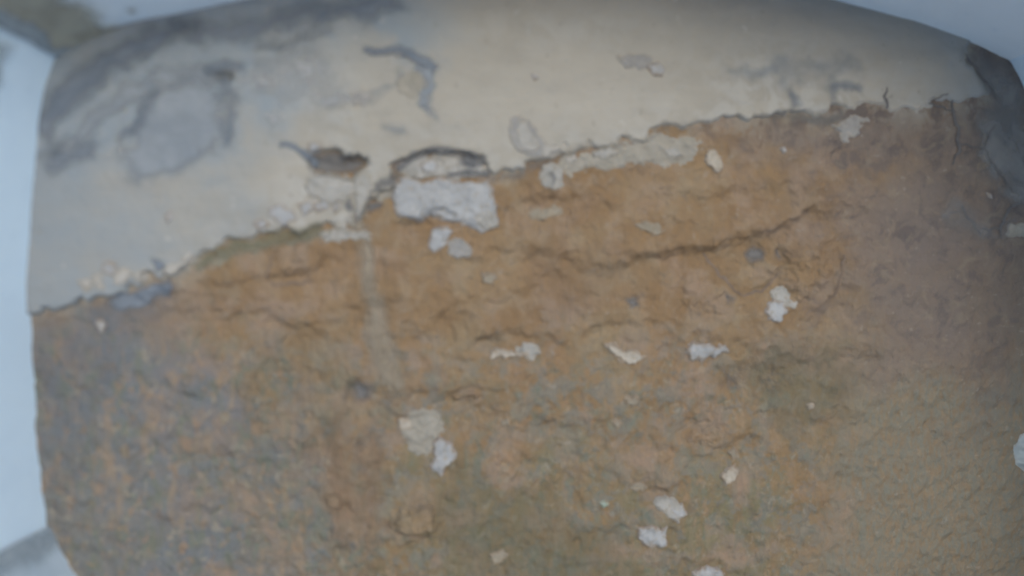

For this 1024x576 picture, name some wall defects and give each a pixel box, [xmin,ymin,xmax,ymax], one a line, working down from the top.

water stain [38,0,402,180]
peeling [508,114,579,163]
spalling [704,148,723,173]
spalling [280,142,501,259]
spalling [764,286,798,323]
spalling [490,342,541,361]
spalling [604,341,647,365]
spalling [684,341,729,362]
spalling [397,408,457,477]
spalling [719,446,740,486]
spalling [627,481,688,549]
spalling [691,565,725,576]